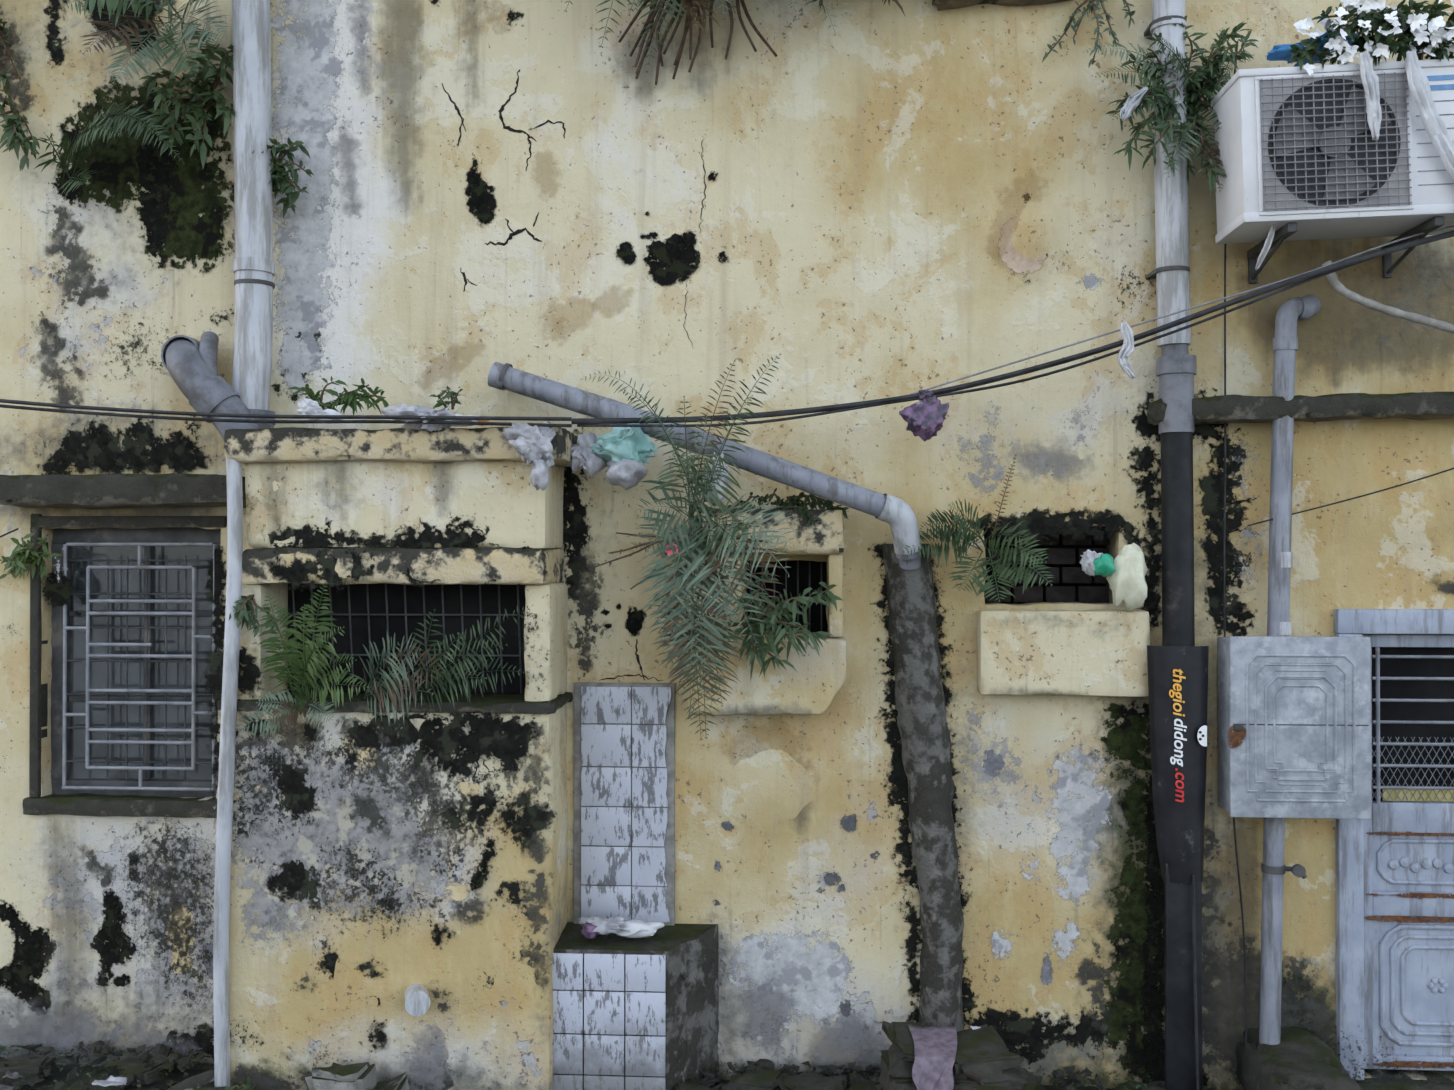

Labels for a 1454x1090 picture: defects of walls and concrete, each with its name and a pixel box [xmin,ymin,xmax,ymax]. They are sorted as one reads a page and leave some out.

water stain [38,0,174,68]
crack [442,83,466,146]
crack [498,70,566,171]
water stain [45,205,170,380]
crack [460,212,542,292]
water stain [198,546,556,984]
water stain [867,543,923,1024]
water stain [931,555,973,914]
water stain [0,817,313,1090]
water stain [817,872,845,893]
rust [1364,893,1454,923]
water stain [358,1019,387,1053]